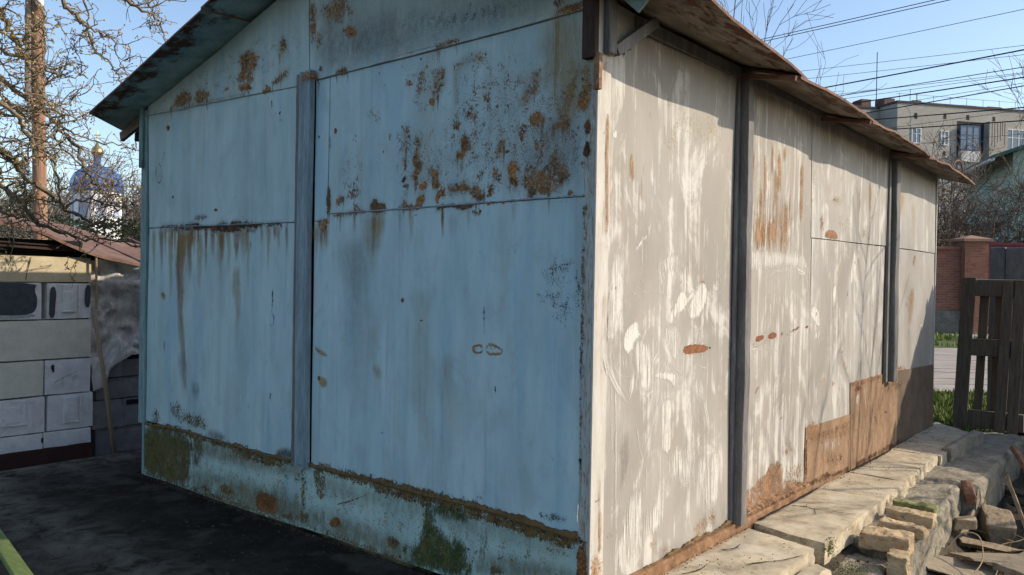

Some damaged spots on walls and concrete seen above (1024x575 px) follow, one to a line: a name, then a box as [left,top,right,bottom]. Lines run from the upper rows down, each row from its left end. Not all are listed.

rust [154,0,357,113]
rust [377,39,592,224]
rust [317,158,386,234]
rust [752,150,803,255]
rust [156,208,288,326]
rust [683,344,711,355]
rust [752,326,808,351]
rust [145,401,612,575]